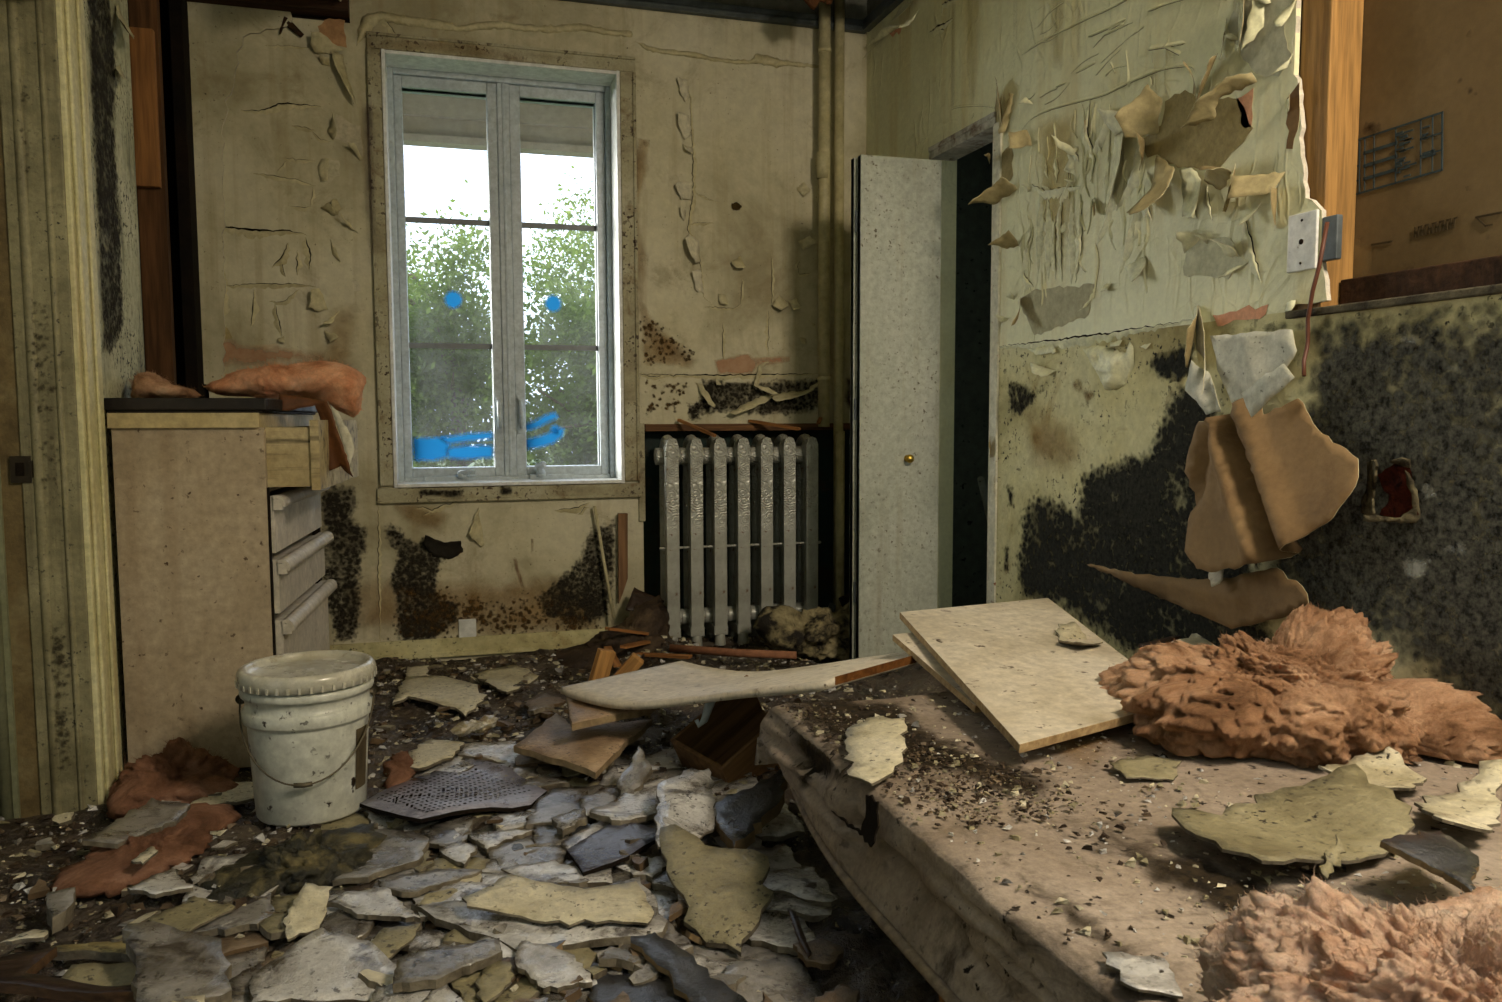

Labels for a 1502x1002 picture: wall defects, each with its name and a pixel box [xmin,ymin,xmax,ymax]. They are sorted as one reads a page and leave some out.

peeling [310,18,363,233]
peeling [969,78,1074,205]
peeling [1052,0,1297,282]
peeling [1286,82,1300,149]
peeling [988,230,1019,249]
water stain [640,317,818,419]
peeling [995,283,1111,377]
peeling [1184,300,1296,368]
water stain [321,485,617,642]
water stain [1004,343,1272,654]
water stain [1277,306,1502,720]